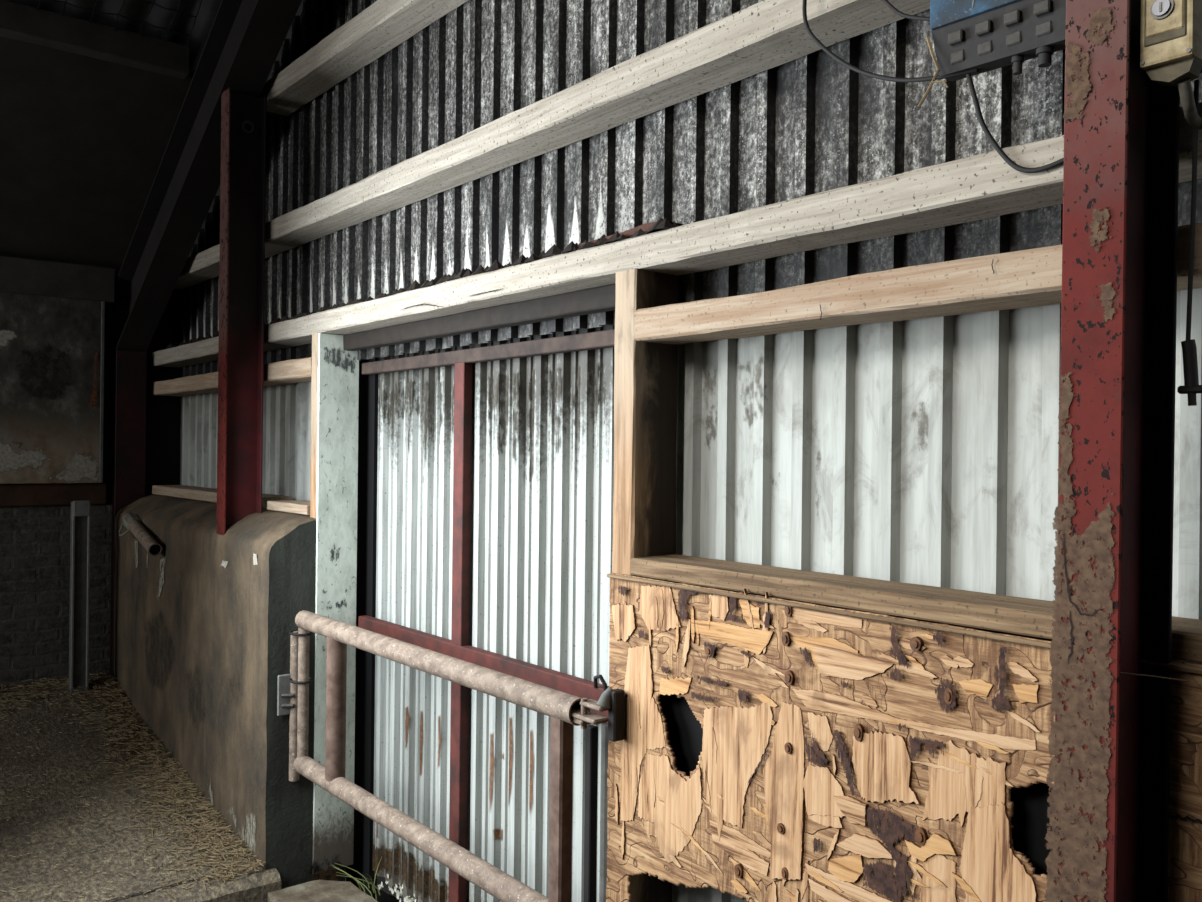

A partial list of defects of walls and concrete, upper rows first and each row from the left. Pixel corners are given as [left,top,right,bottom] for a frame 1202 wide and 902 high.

peeling [1063,8,1114,121]
peeling [1089,208,1112,254]
peeling [1099,282,1117,322]
water stain [381,380,454,460]
water stain [488,363,606,481]
peeling [612,372,1115,902]
rust [405,707,423,775]
rust [489,718,513,806]